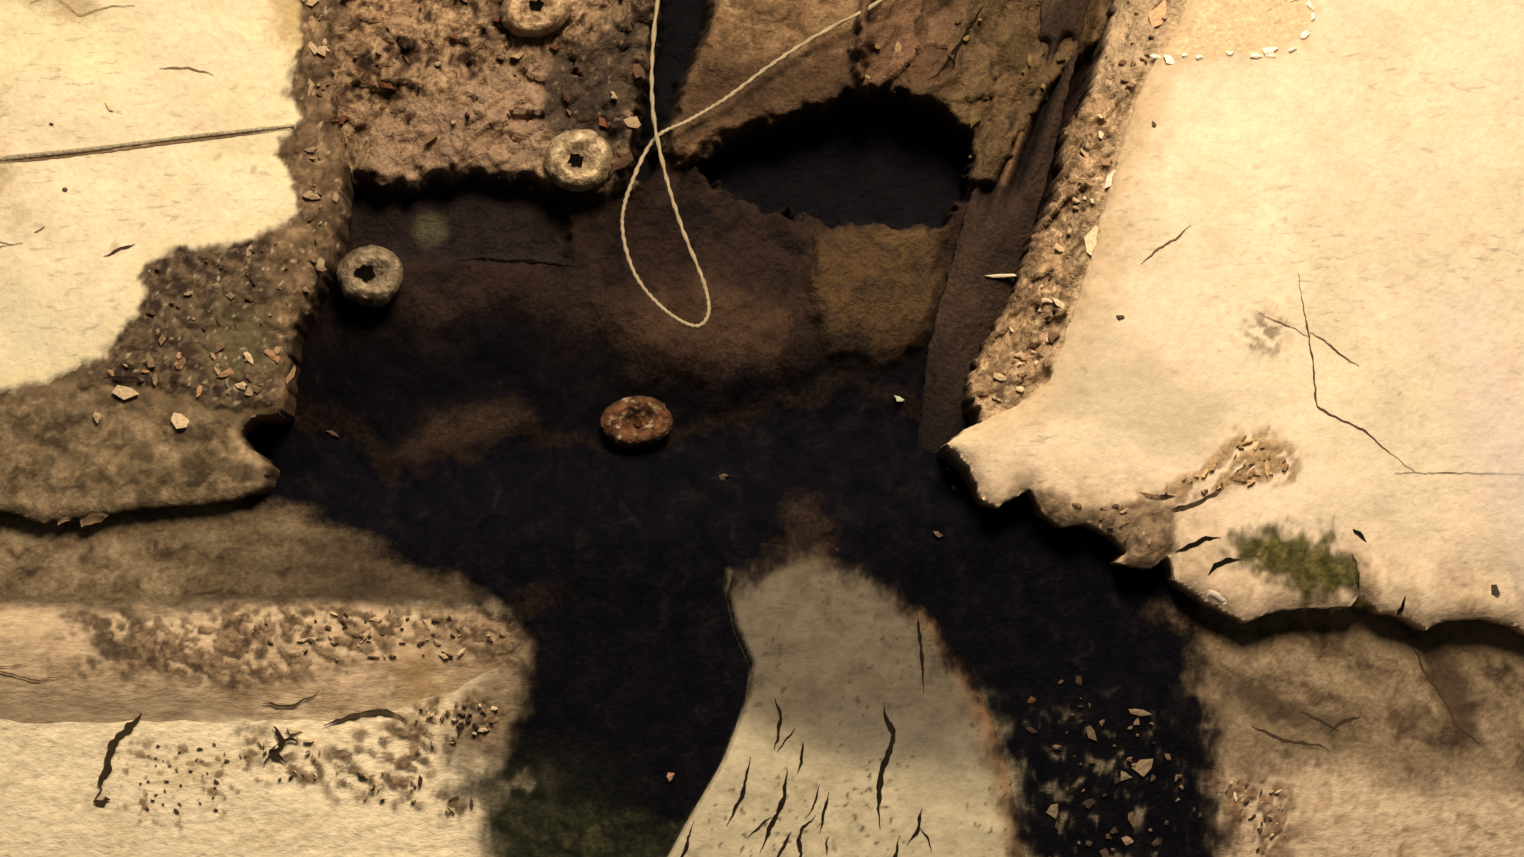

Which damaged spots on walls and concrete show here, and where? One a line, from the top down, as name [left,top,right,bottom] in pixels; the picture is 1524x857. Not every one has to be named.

spalling [78,0,1315,429]
spalling [376,390,545,478]
spalling [1034,431,1298,565]
crack [1259,273,1519,474]
peeling [85,598,526,689]
water stain [0,295,1524,857]
crack [916,612,924,692]
peeling [93,690,510,825]
crack [680,698,829,857]
crack [876,702,931,857]